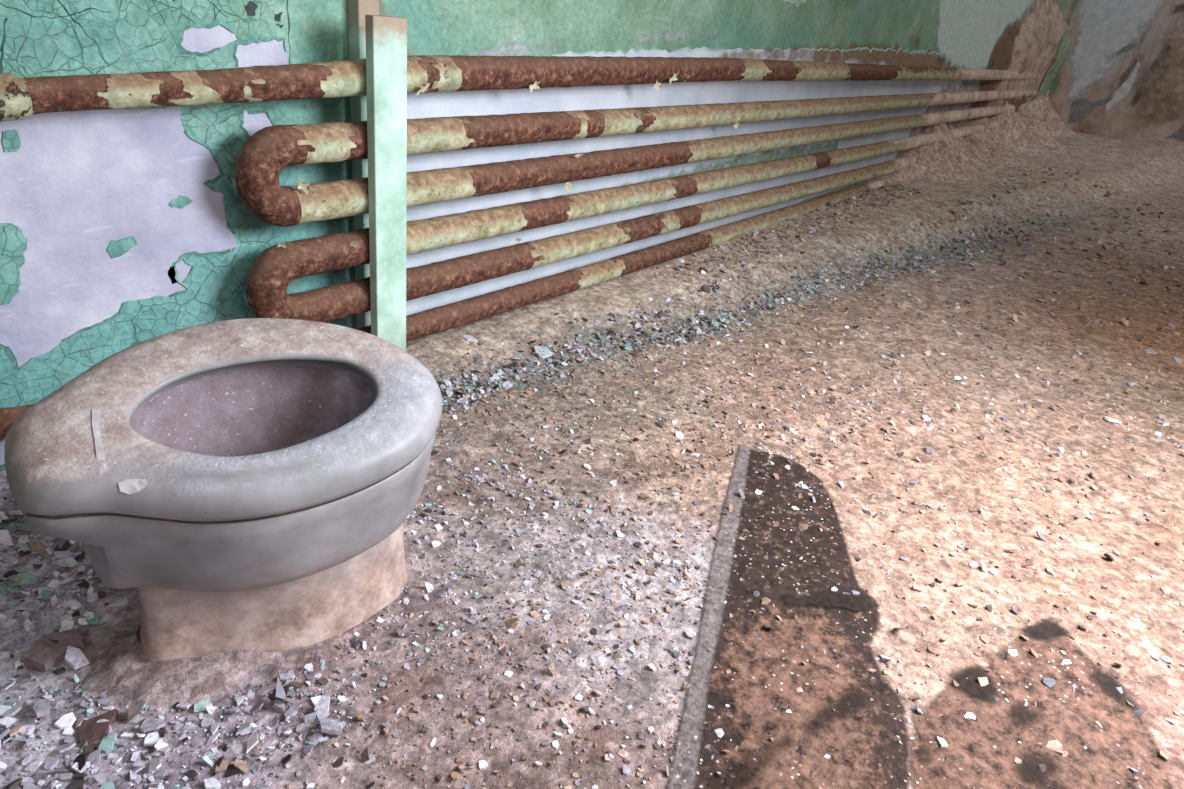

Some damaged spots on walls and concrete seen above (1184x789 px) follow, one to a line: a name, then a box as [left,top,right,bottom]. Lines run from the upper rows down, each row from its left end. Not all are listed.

crack [0,0,111,73]
peeling [177,12,288,68]
spalling [244,1,258,16]
crack [284,0,292,64]
rust [720,39,954,81]
peeling [1068,0,1164,122]
peeling [406,0,1060,268]
peeling [0,106,275,372]
peeling [406,185,849,316]